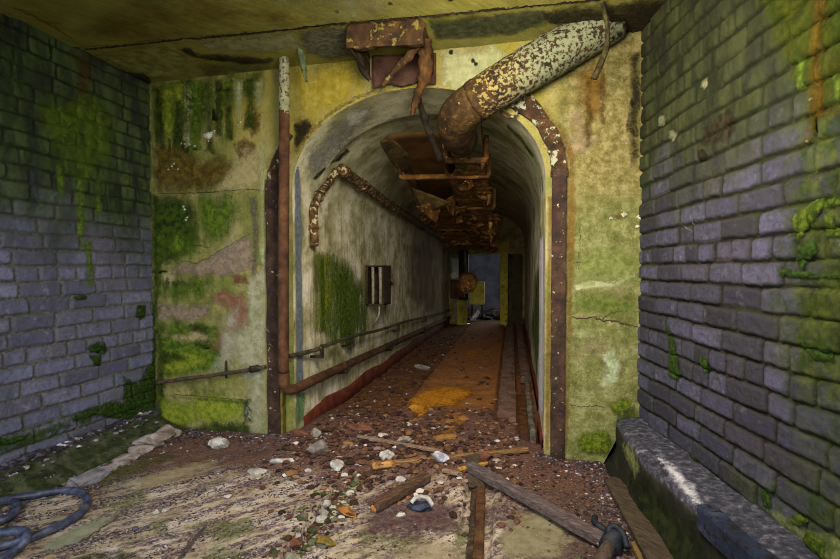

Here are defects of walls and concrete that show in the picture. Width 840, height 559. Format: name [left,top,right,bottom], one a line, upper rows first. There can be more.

crack [13,0,599,85]
rust [584,69,604,147]
rust [809,0,840,130]
damp [152,71,265,430]